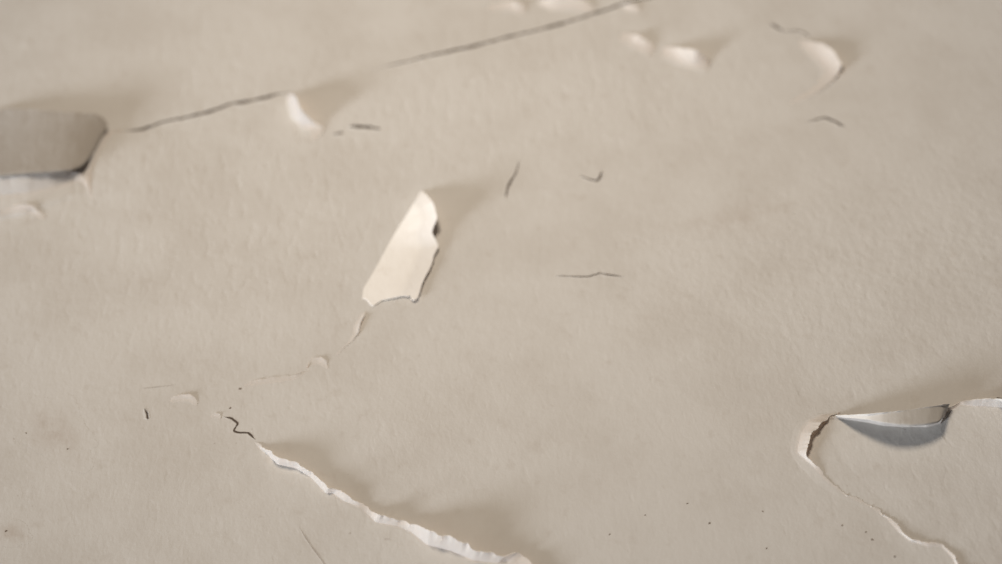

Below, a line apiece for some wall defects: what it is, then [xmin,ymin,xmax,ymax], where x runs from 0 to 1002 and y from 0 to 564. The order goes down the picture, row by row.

crack [371,0,659,70]
peeling [538,0,595,13]
peeling [620,33,711,74]
crack [768,23,810,38]
peeling [790,39,842,104]
crack [118,91,294,131]
peeling [286,94,324,141]
peeling [0,109,247,232]
peeling [307,191,438,369]
peeling [165,442,532,564]
flaking render [790,397,1002,564]